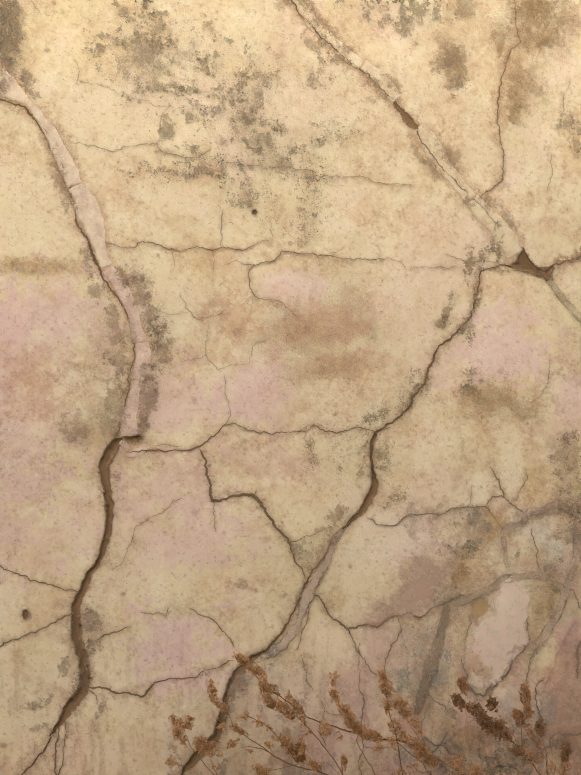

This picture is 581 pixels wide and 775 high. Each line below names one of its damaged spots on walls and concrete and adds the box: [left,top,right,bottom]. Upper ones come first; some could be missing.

crack [0,99,47,139]
leakage [83,0,367,245]
crack [76,142,411,185]
crack [291,0,521,224]
crack [0,198,581,775]
peeling [466,578,531,689]